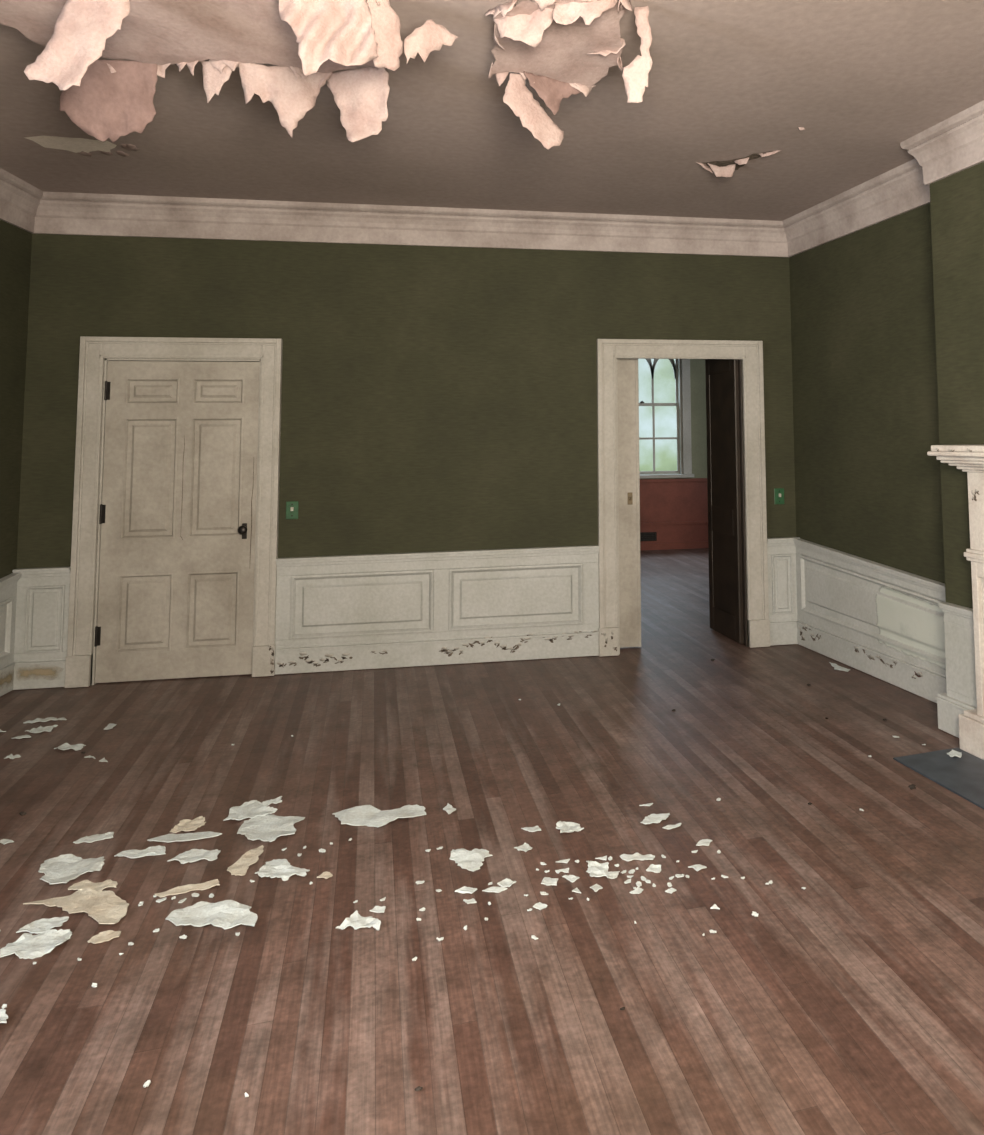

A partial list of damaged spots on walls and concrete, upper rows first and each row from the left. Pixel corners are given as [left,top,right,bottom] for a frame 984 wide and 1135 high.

peeling [0,0,458,157]
peeling [485,0,653,150]
peeling [696,150,779,177]
peeling [439,630,617,657]